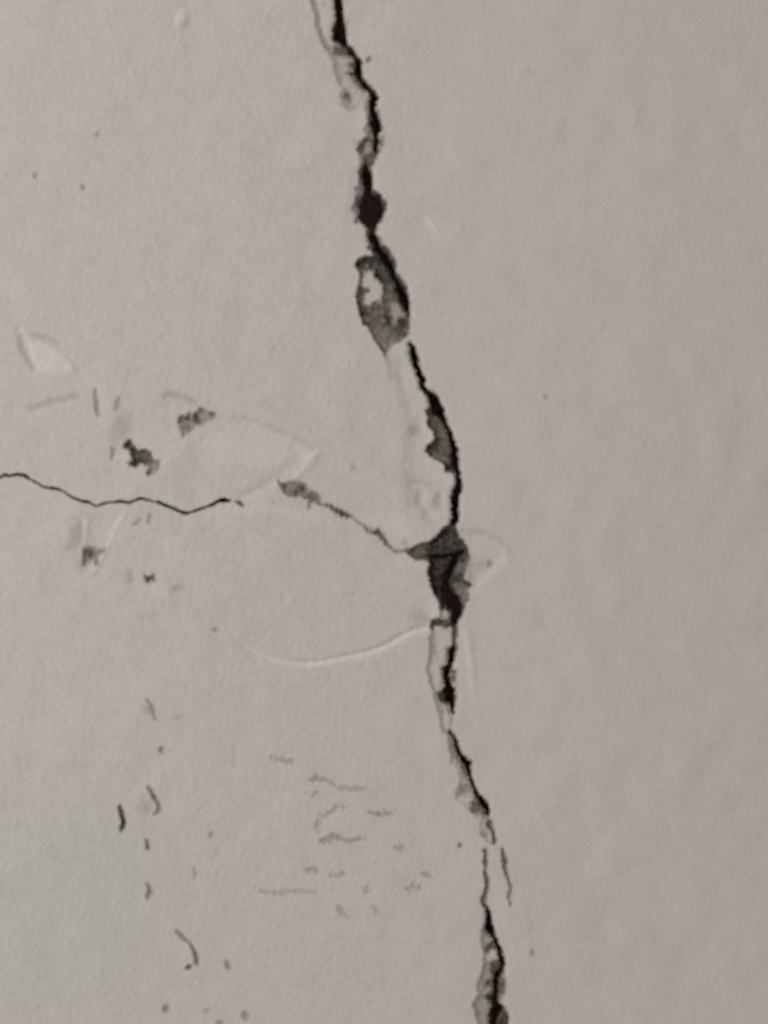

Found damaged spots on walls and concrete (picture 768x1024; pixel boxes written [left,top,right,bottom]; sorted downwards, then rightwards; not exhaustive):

crack [309,0,409,318]
crack [0,472,244,515]
peeling [122,438,161,477]
peeling [177,407,217,438]
crack [410,348,461,526]
crack [259,479,513,1024]